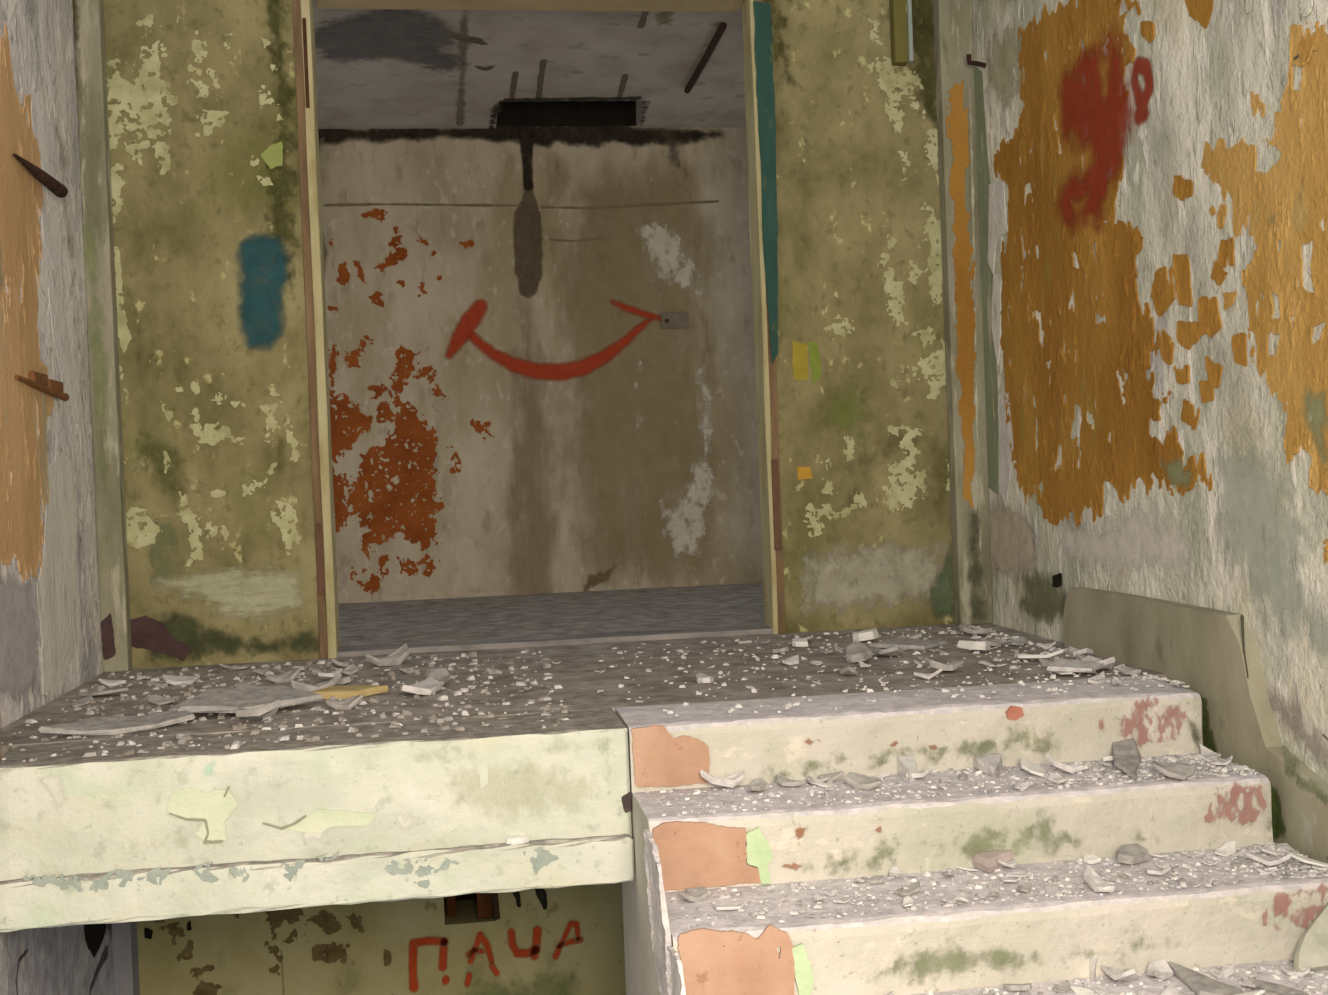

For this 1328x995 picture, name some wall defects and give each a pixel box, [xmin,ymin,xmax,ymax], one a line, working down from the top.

water stain [514,126,542,297]
peeling [866,0,1328,549]
peeling [0,7,462,711]
peeling [803,425,927,538]
peeling [1122,697,1187,747]
peeling [621,725,836,813]
peeling [167,786,238,841]
peeling [23,867,171,893]
flaking render [154,919,222,995]
flaking render [264,908,364,976]
peeling [384,857,460,889]
peeling [644,821,814,995]